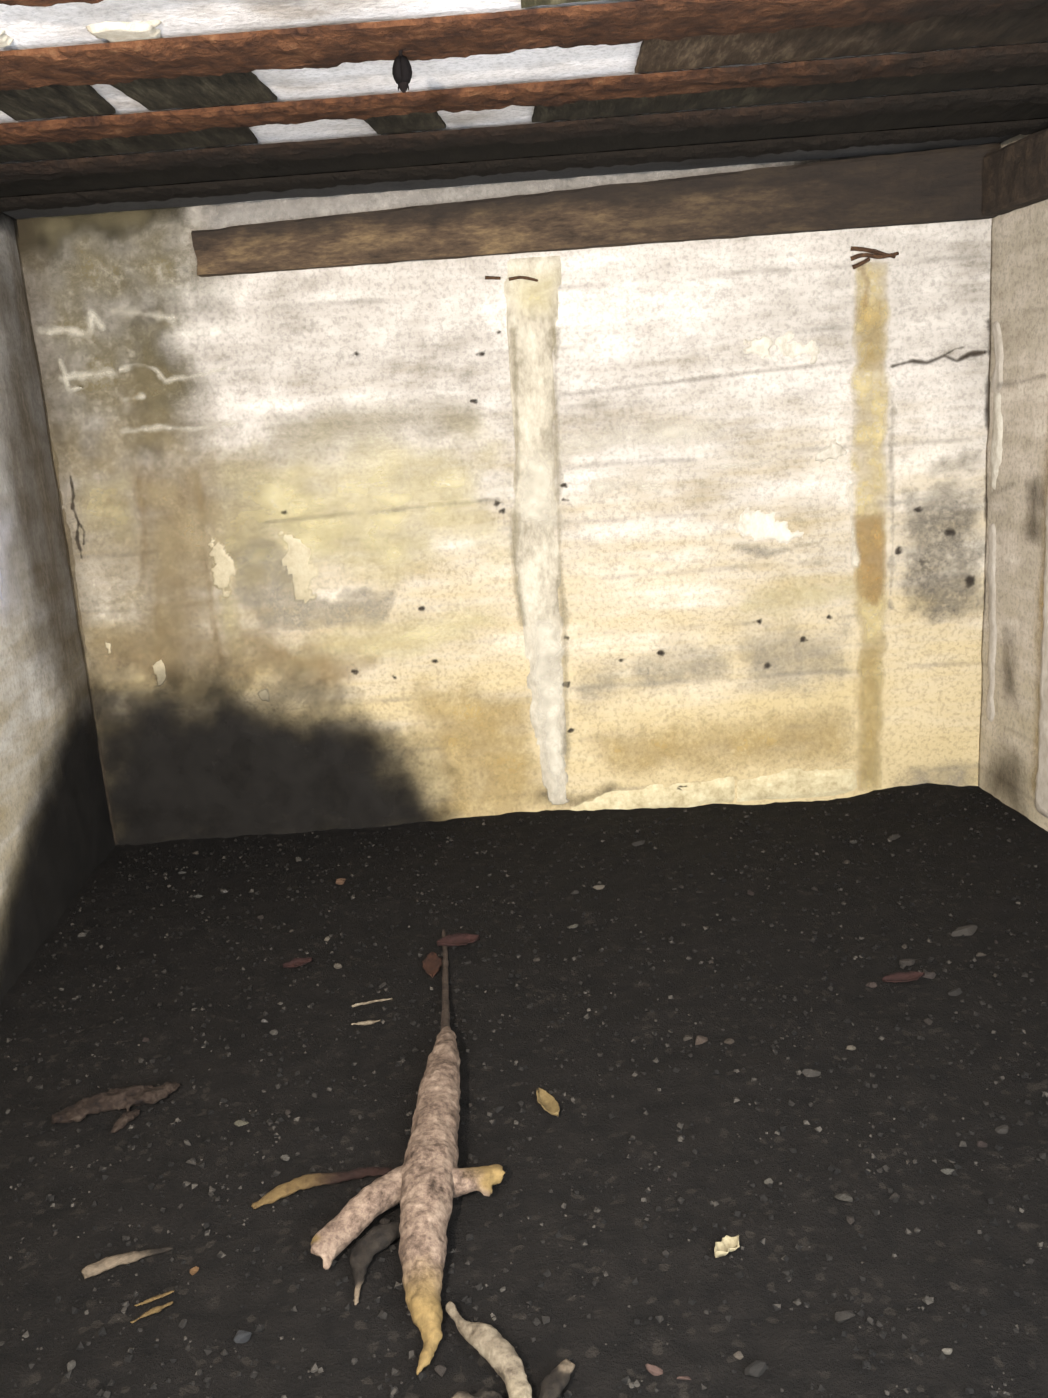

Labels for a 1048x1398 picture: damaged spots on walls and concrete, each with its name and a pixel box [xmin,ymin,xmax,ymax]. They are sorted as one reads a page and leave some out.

crack [892,320,991,428]
peeling [207,511,380,626]
corrosion [849,265,893,790]
crack [982,487,990,598]